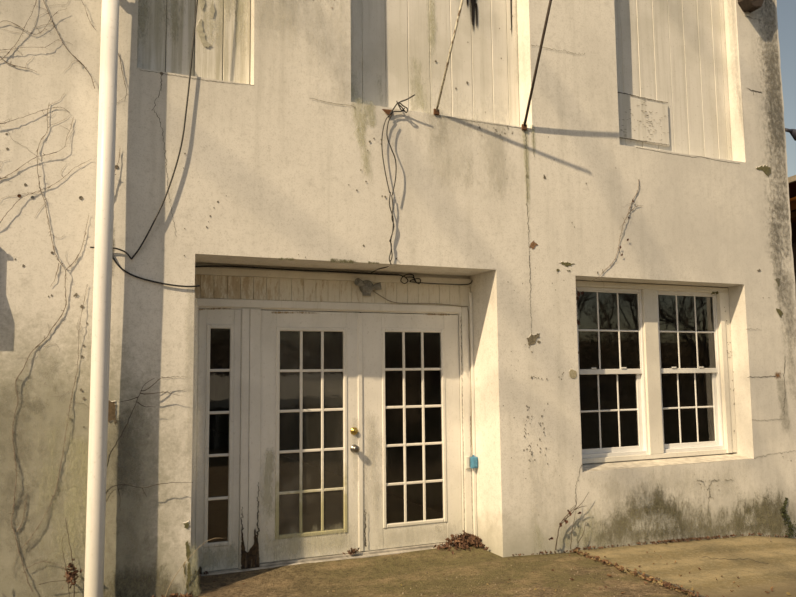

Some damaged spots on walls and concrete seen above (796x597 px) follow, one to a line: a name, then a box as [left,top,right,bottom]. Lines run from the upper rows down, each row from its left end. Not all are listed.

water stain [765,2,795,333]
crack [436,116,535,333]
peeling [525,333,540,352]
peeling [108,400,117,424]
water stain [585,491,787,547]